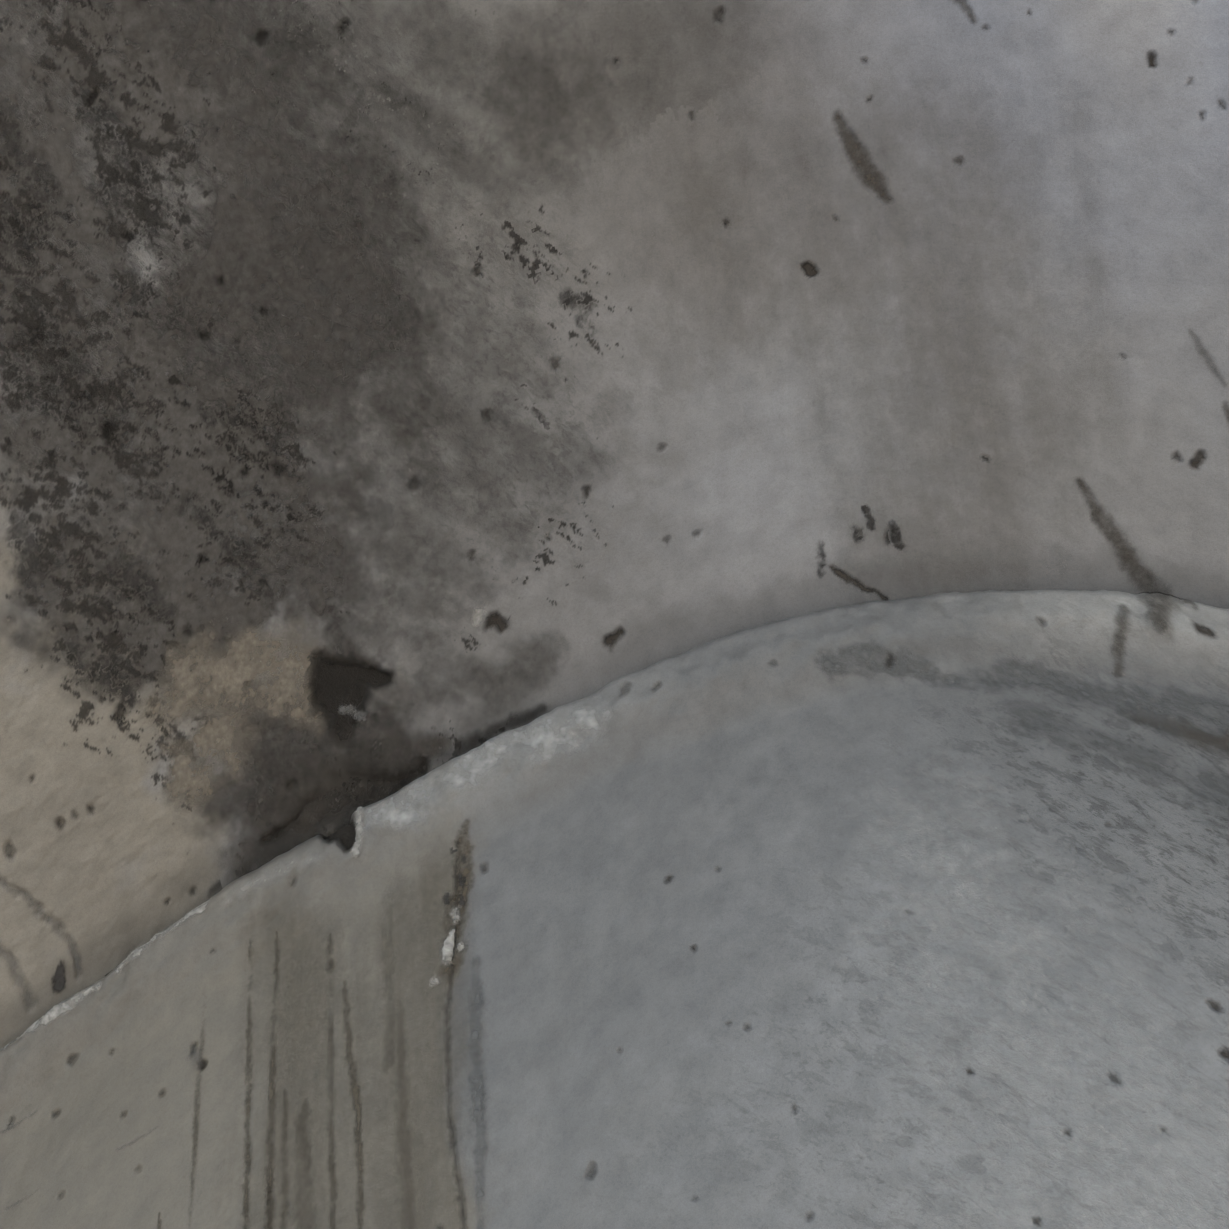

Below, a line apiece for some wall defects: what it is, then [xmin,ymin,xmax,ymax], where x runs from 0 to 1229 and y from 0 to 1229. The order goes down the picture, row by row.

leakage [834,114,890,201]
leakage [502,206,618,353]
leakage [0,0,455,872]
leakage [523,518,606,584]
leakage [1077,479,1158,594]
spalling [310,652,392,753]
leakage [439,709,610,787]
leakage [424,890,464,1017]
leakage [0,985,100,1051]
leakage [243,1008,251,1229]
leakage [329,982,363,1229]
crack [440,858,486,1229]